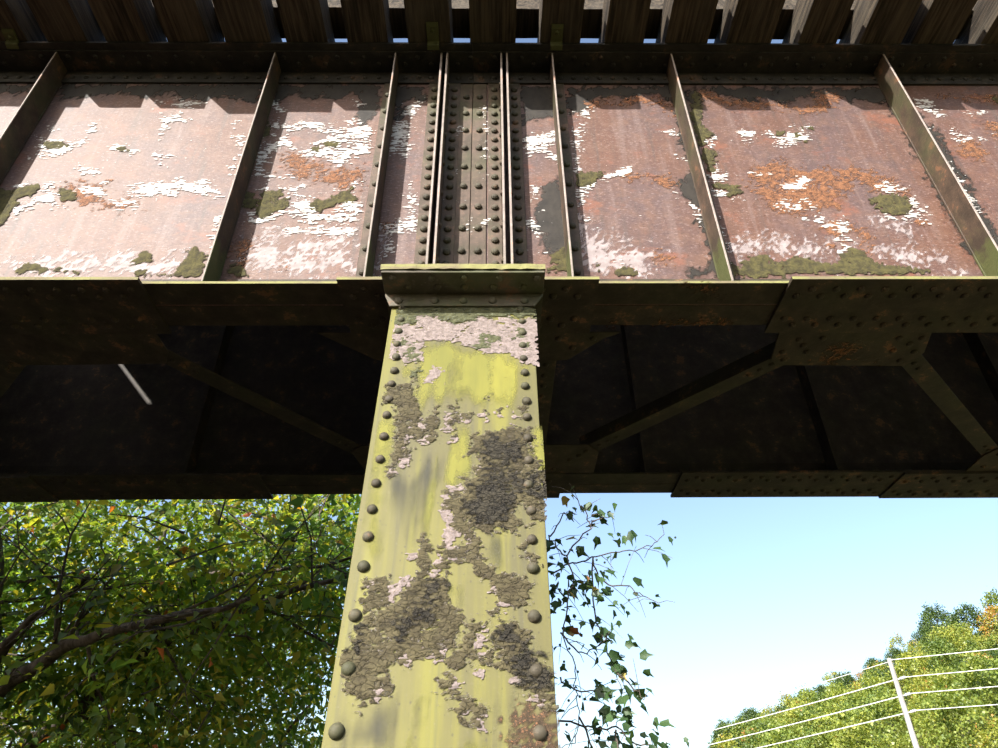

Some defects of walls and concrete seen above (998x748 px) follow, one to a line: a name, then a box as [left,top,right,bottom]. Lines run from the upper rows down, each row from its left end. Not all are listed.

peeling [28,123,97,159]
peeling [73,165,225,217]
peeling [244,99,376,241]
peeling [522,131,558,164]
peeling [571,107,593,173]
peeling [575,166,632,207]
peeling [707,164,772,202]
peeling [731,125,813,148]
peeling [775,169,858,254]
rust [742,159,911,255]
peeling [874,181,939,229]
peeling [339,315,559,733]